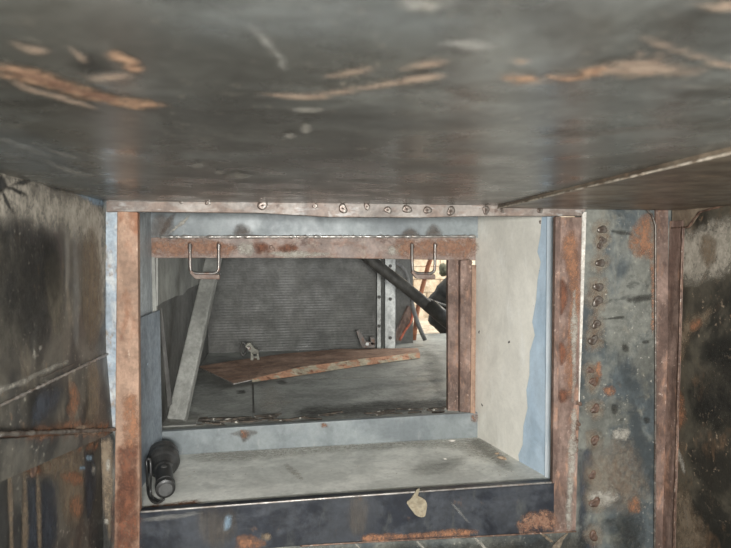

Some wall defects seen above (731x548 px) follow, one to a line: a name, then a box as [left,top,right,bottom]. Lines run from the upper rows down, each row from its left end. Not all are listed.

damp [3,180,30,212]
rust [151,239,234,257]
rust [395,239,477,258]
damp [683,221,731,281]
rust [559,233,580,402]
rust [30,364,109,522]
rust [114,395,139,548]
rust [362,530,472,542]
rust [518,511,558,533]